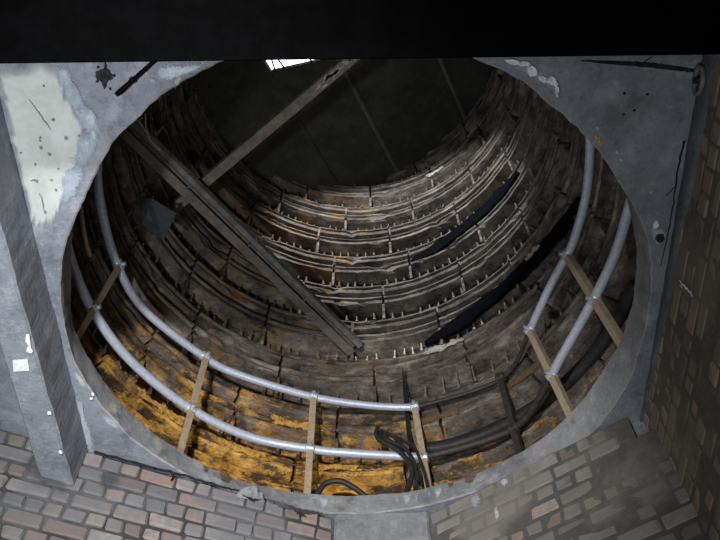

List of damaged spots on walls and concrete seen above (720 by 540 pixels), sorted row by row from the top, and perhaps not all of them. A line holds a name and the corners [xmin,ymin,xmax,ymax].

peeling [504,58,559,97]
crack [581,56,700,77]
leakage [55,67,124,202]
crack [660,141,685,266]
crack [94,451,239,491]